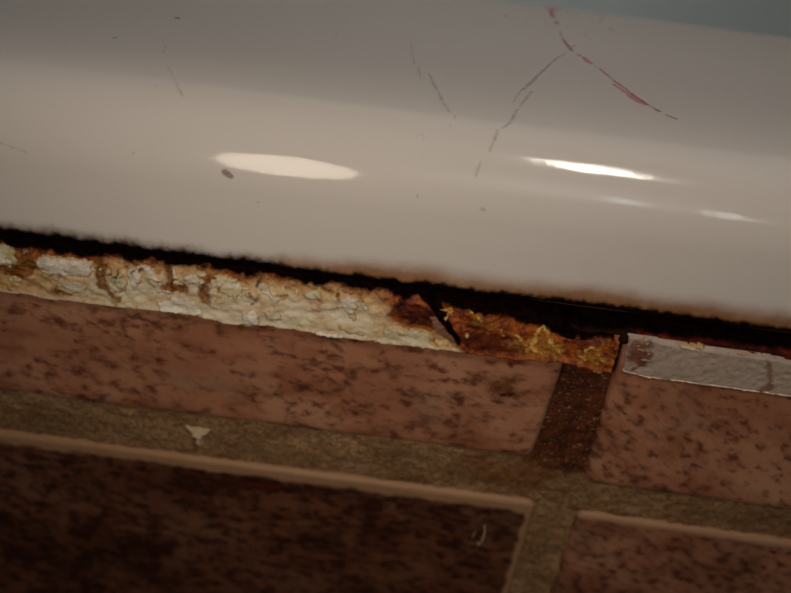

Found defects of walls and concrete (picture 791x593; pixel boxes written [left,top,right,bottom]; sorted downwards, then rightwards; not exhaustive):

rust [0,248,37,278]
damp [0,226,791,348]
rust [302,265,791,329]
rust [389,294,791,473]